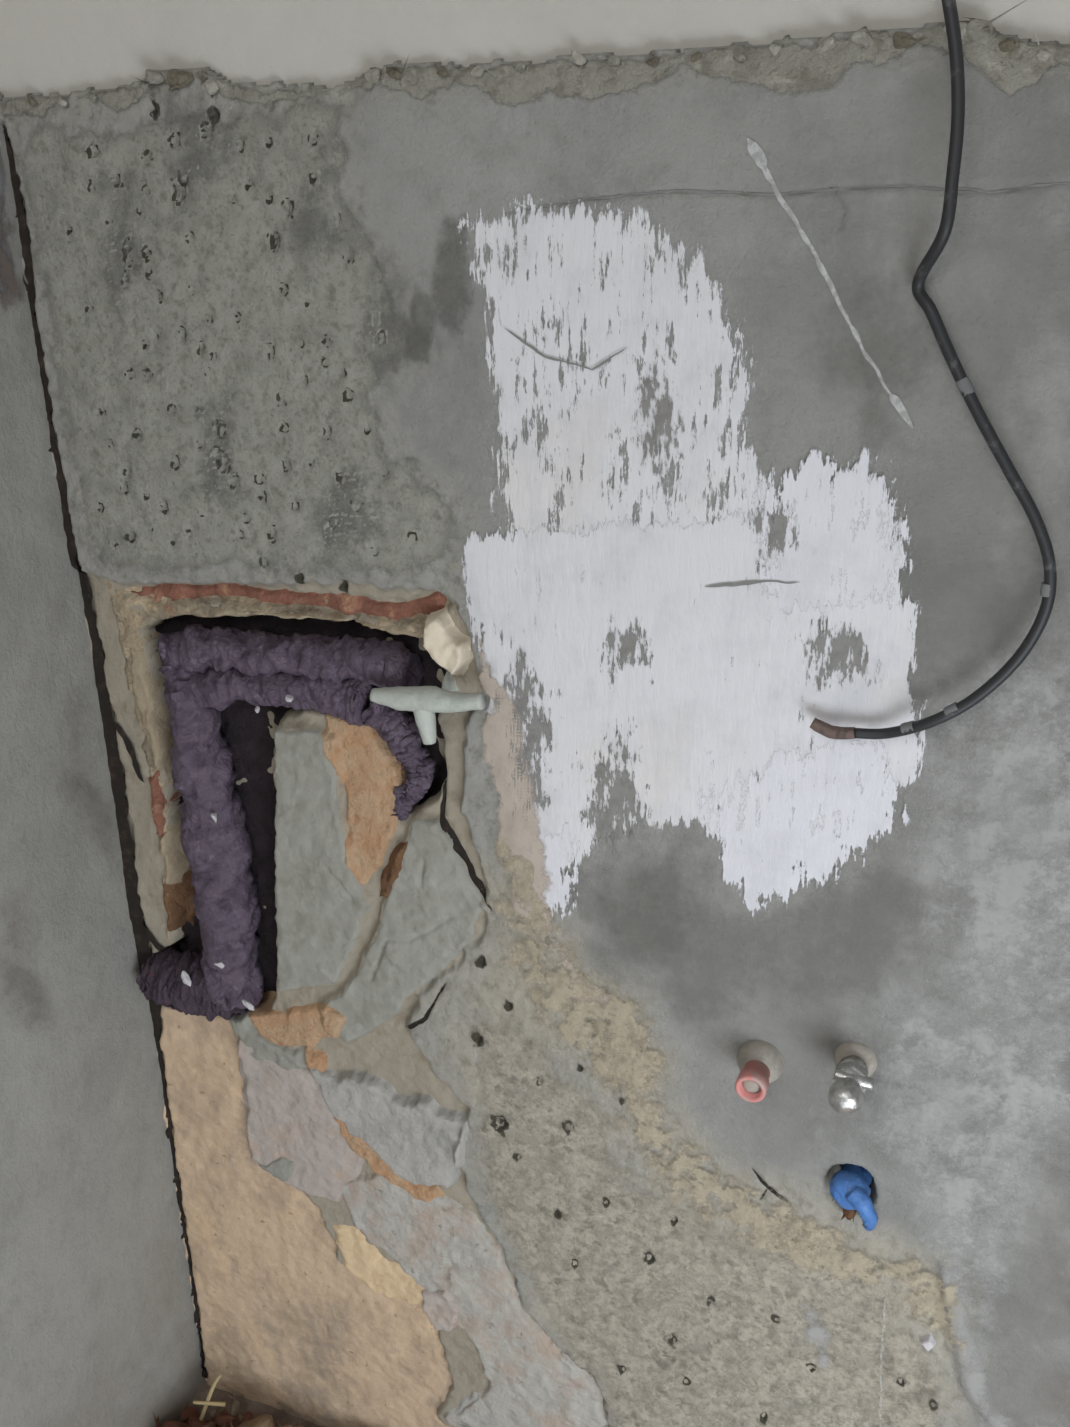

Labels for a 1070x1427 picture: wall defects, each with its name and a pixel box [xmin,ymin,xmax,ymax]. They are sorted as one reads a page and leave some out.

crack [507,182,1070,229]
flaking render [1,0,1070,692]
flaking render [148,770,180,836]
crack [440,760,492,911]
peeling [181,971,192,986]
crack [405,985,445,1029]
flaking render [155,991,938,1427]